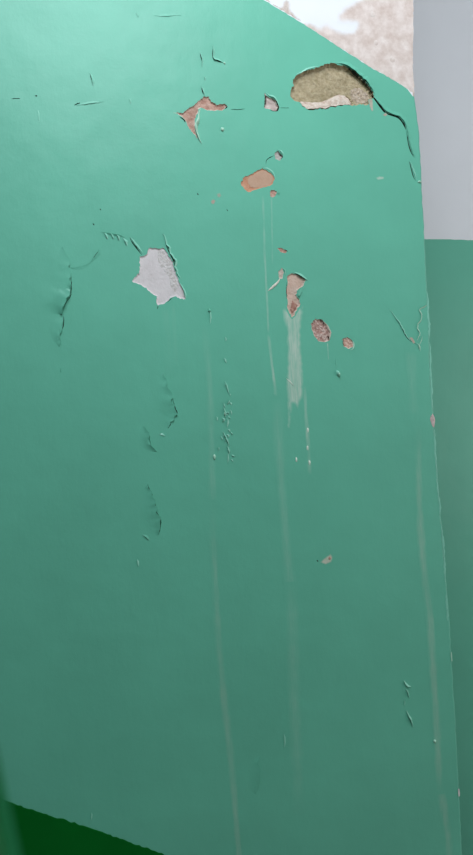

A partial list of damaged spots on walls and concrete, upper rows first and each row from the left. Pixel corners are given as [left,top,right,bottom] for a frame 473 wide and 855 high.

peeling [267,0,415,112]
peeling [173,46,227,144]
flaking render [241,150,283,197]
peeling [264,93,279,112]
crack [371,95,421,183]
peeling [130,234,186,309]
peeling [278,268,307,317]
peeling [311,319,331,360]
peeling [342,337,355,350]
water stain [261,195,312,818]